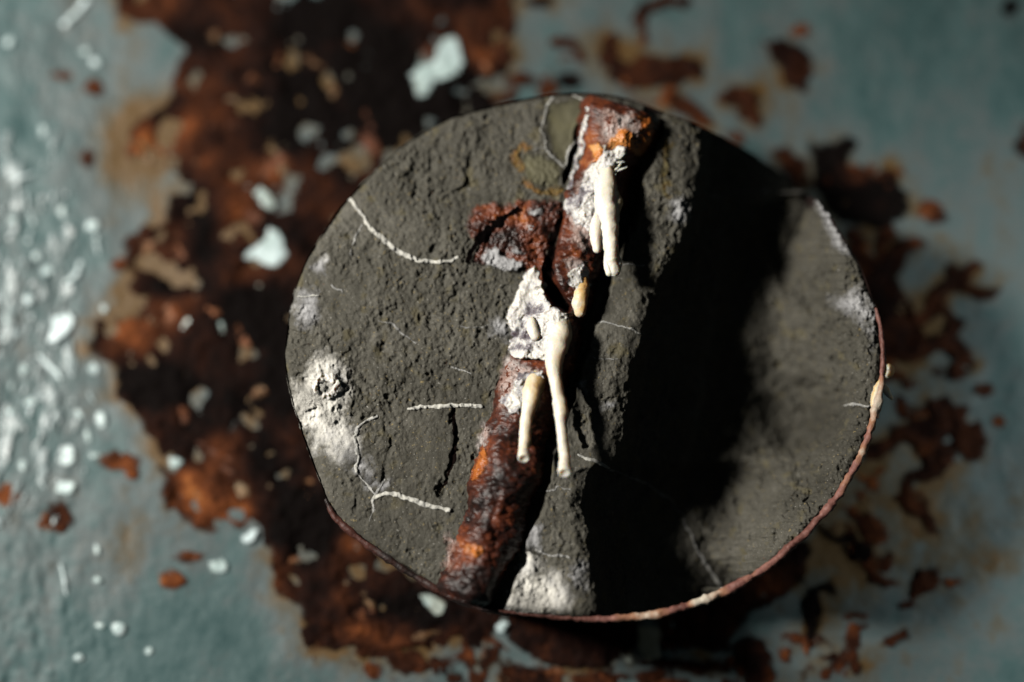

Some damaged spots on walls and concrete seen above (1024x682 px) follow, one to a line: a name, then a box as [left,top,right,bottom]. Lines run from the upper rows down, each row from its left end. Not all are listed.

rust [79,148,94,167]
crack [348,197,459,264]
crack [531,95,583,311]
leakage [564,106,642,292]
rust [83,0,868,682]
leakage [493,266,568,414]
rust [773,136,1005,588]
crack [353,403,483,518]
rust [899,567,960,610]